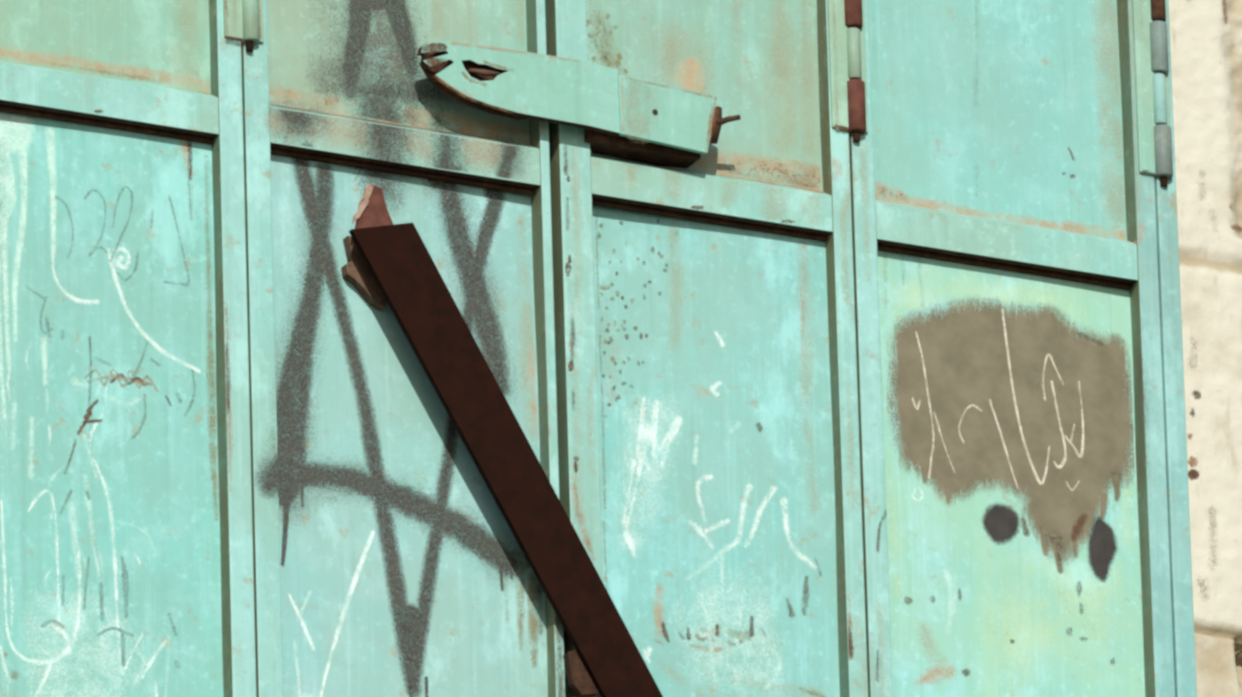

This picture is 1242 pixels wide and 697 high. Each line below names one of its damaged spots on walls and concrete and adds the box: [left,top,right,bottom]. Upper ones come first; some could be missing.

corrosion [0,44,222,95]
corrosion [341,183,687,697]
corrosion [269,0,1145,515]